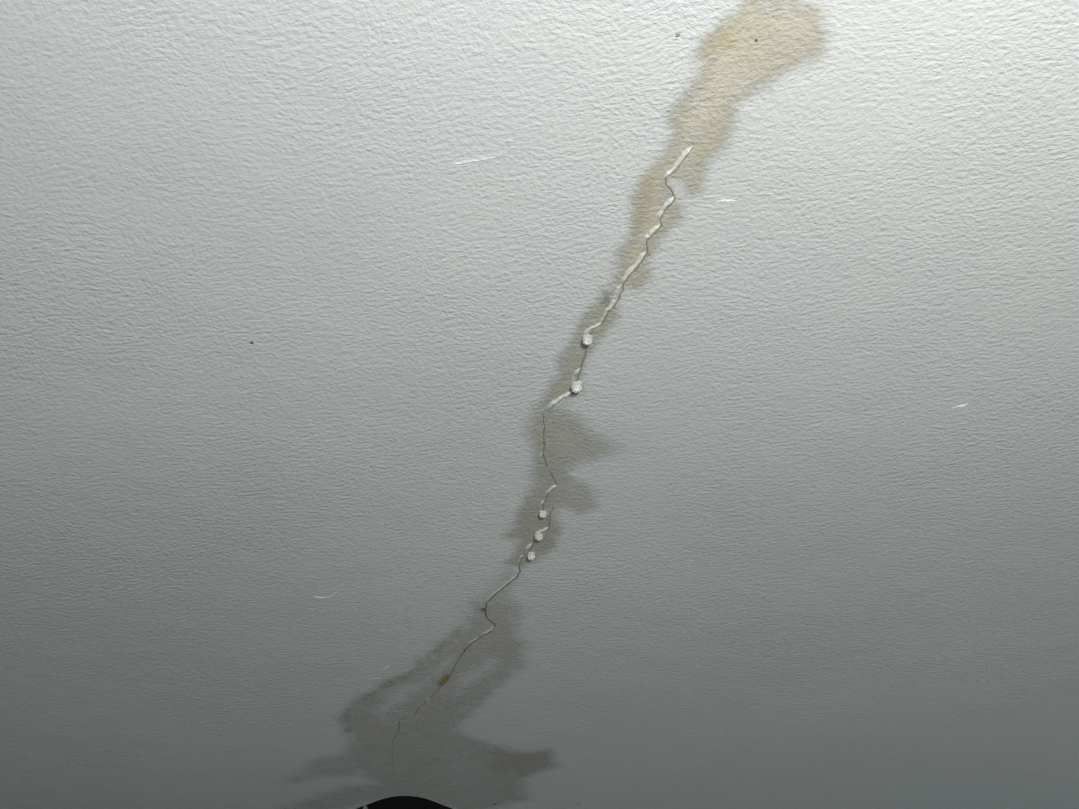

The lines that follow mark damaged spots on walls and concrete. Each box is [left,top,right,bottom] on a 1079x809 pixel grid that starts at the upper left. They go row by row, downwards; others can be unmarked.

leakage [351,604,546,809]
crack [392,146,693,789]
leakage [510,0,824,565]